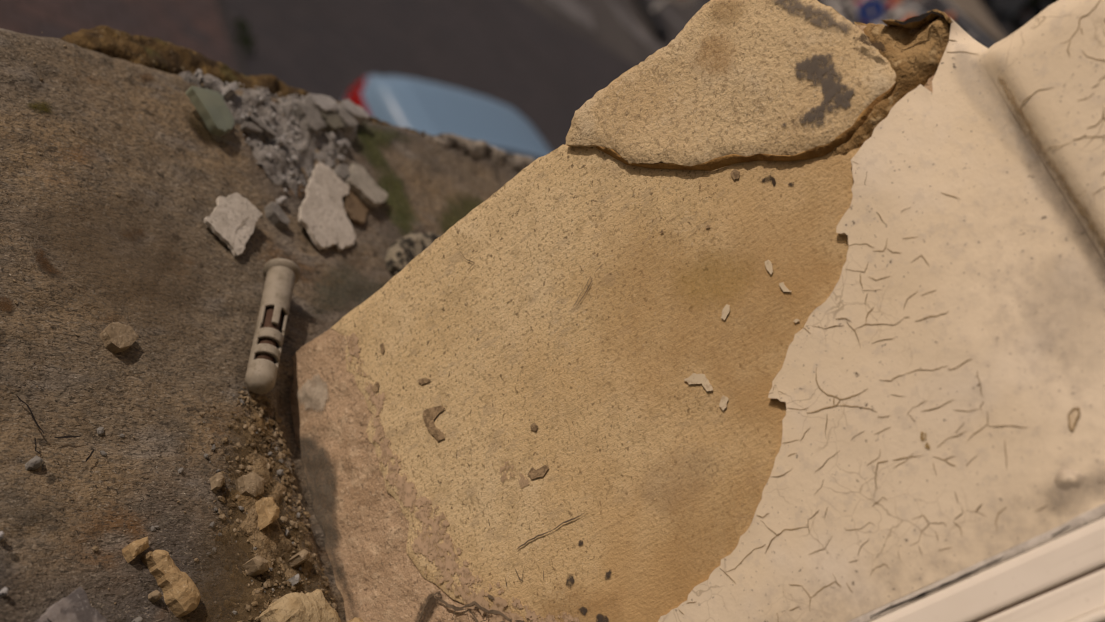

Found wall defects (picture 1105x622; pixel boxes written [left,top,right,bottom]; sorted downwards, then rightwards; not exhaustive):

crack [1047,0,1105,151]
water stain [298,374,328,410]
peeling [61,9,953,622]
crack [803,161,947,345]
water stain [299,437,350,597]
crack [721,359,1025,617]